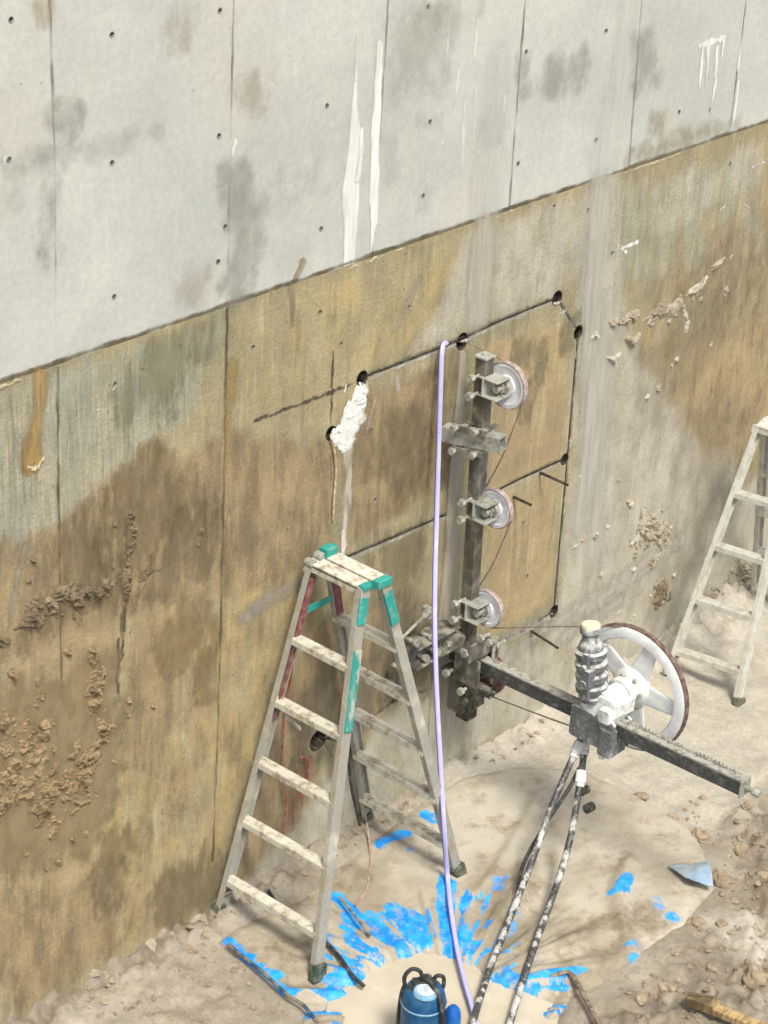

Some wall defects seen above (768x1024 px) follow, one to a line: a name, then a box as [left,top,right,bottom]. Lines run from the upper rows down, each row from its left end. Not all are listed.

leakage [698,34,726,103]
leakage [733,13,743,123]
leakage [342,39,383,266]
spalling [575,254,733,364]
corrosion [23,368,48,477]
leakage [160,605,215,702]
leakage [305,676,334,722]
leakage [357,681,381,713]
leakage [399,604,415,637]
spalling [624,498,677,611]
spalling [705,559,752,599]
leakage [156,853,221,926]